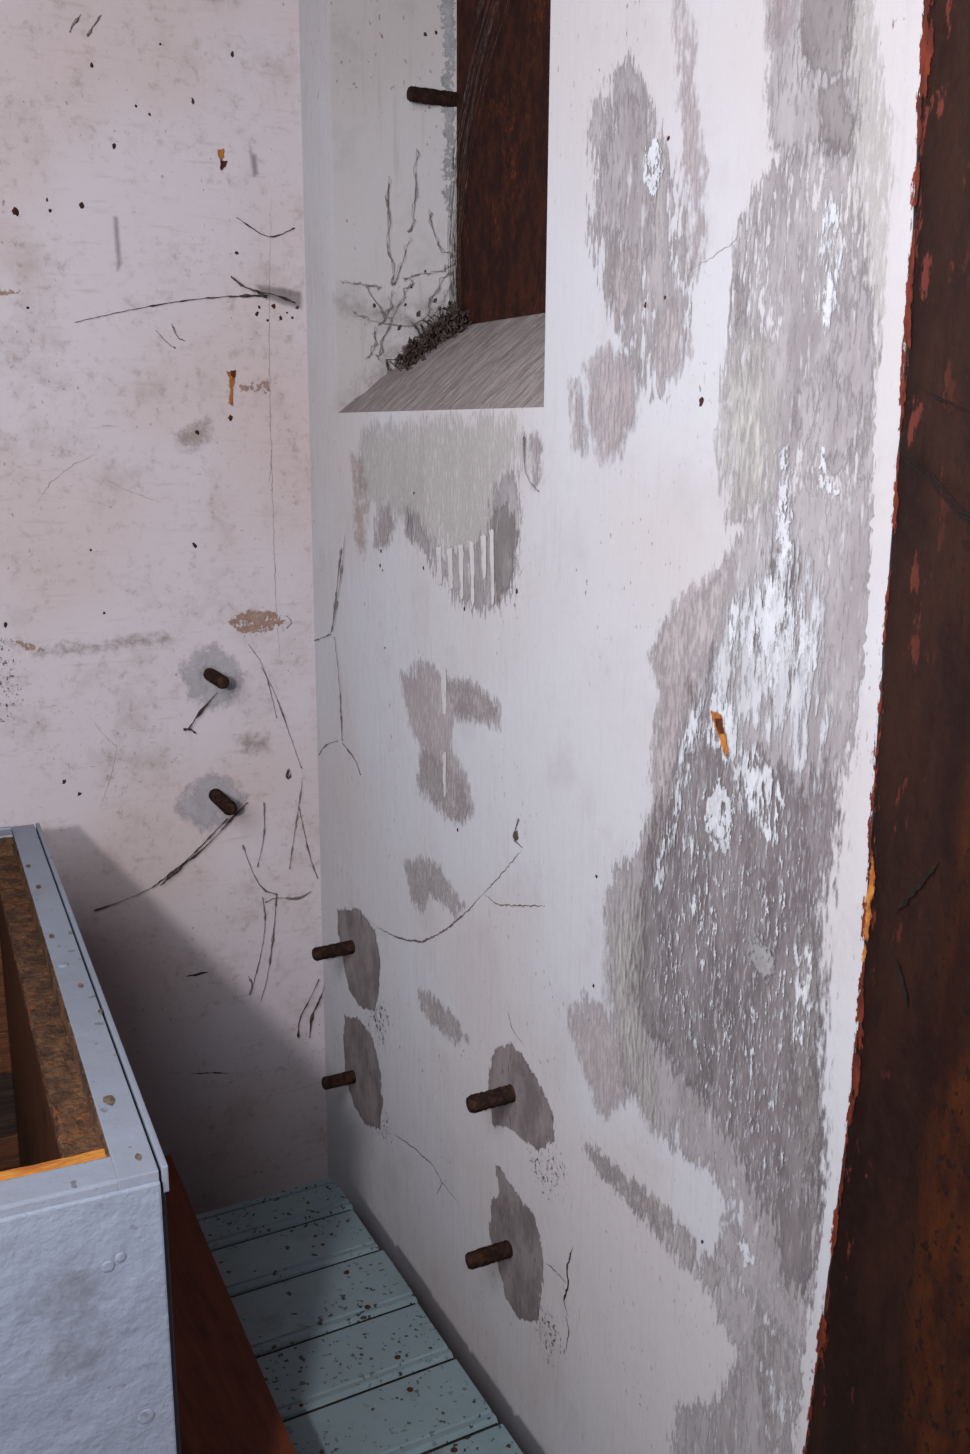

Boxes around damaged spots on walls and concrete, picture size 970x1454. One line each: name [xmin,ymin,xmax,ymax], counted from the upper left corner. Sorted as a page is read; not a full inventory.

leakage [359,409,541,616]
peeling [177,776,242,828]
peeling [182,645,241,707]
leakage [401,658,501,823]
corrosion [711,711,728,758]
leakage [567,0,893,1454]
crack [353,854,544,943]
corrosion [861,839,875,962]